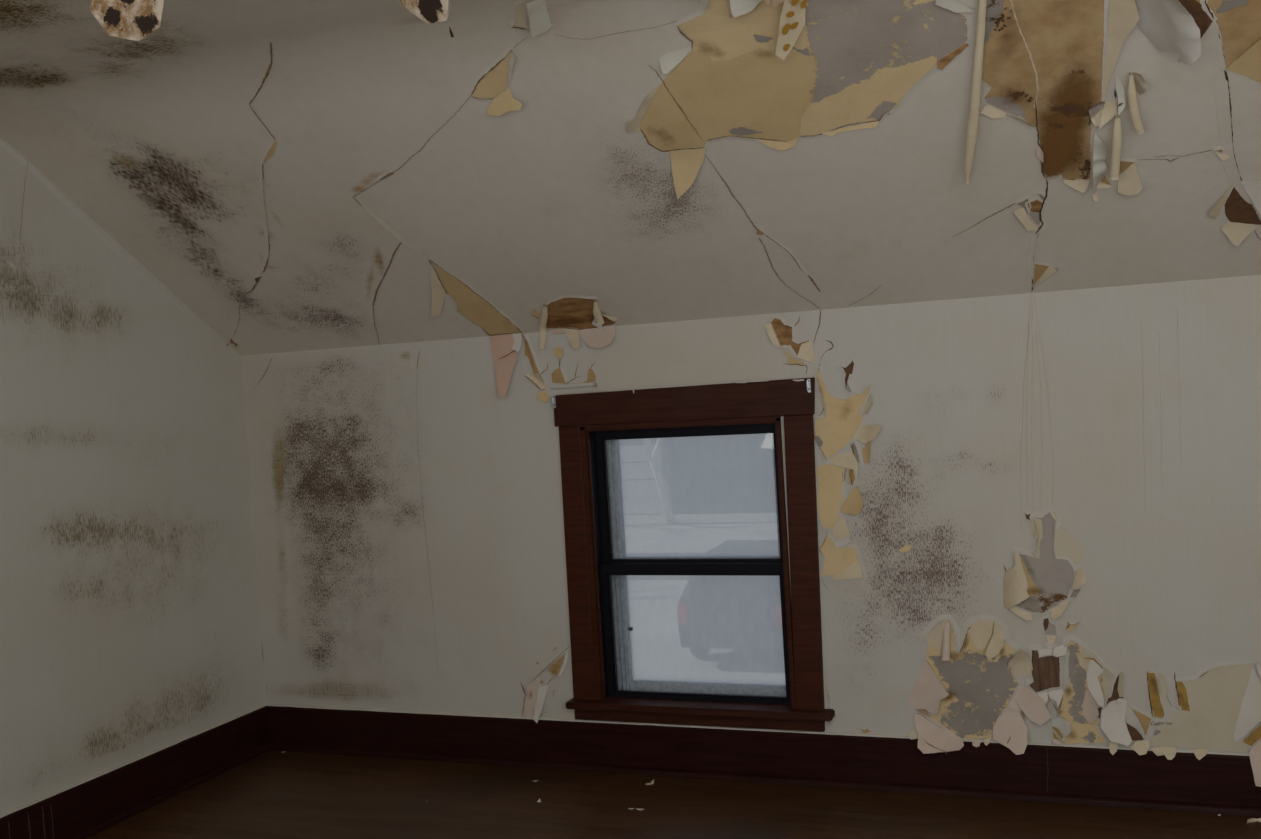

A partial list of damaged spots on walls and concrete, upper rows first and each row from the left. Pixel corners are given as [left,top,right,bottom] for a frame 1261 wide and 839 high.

leakage [0,0,204,78]
leakage [986,0,1012,36]
flaking render [984,97,1027,121]
leakage [1009,67,1093,179]
leakage [104,135,379,338]
crack [227,42,282,346]
crack [650,66,881,416]
leakage [38,501,217,629]
leakage [260,357,428,671]
leakage [837,432,994,696]
flaking render [1016,512,1074,612]